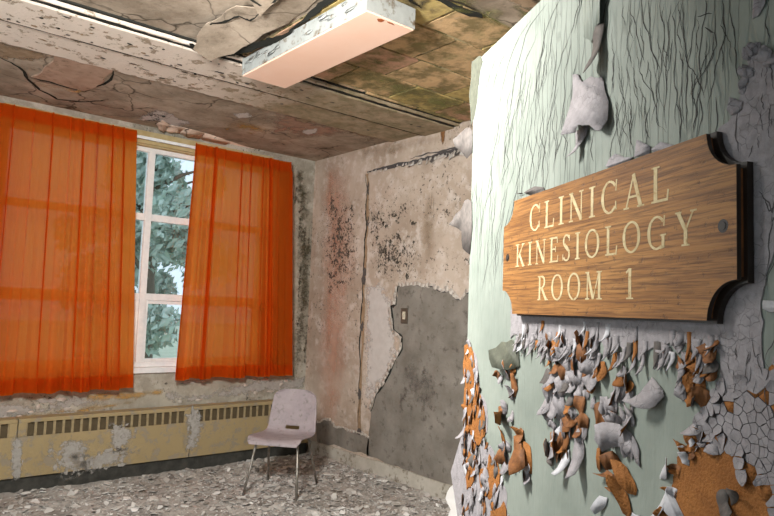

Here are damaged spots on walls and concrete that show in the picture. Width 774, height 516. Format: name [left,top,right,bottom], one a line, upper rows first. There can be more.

crack [0,57,114,102]
peeling [193,0,357,87]
spalling [313,0,511,159]
peeling [561,0,609,157]
crack [590,0,774,160]
leakage [325,193,358,293]
spalling [316,42,774,516]
crack [760,192,774,279]
peeling [10,438,23,480]
peeling [0,397,99,418]
peeling [48,423,137,476]
crack [728,340,774,439]